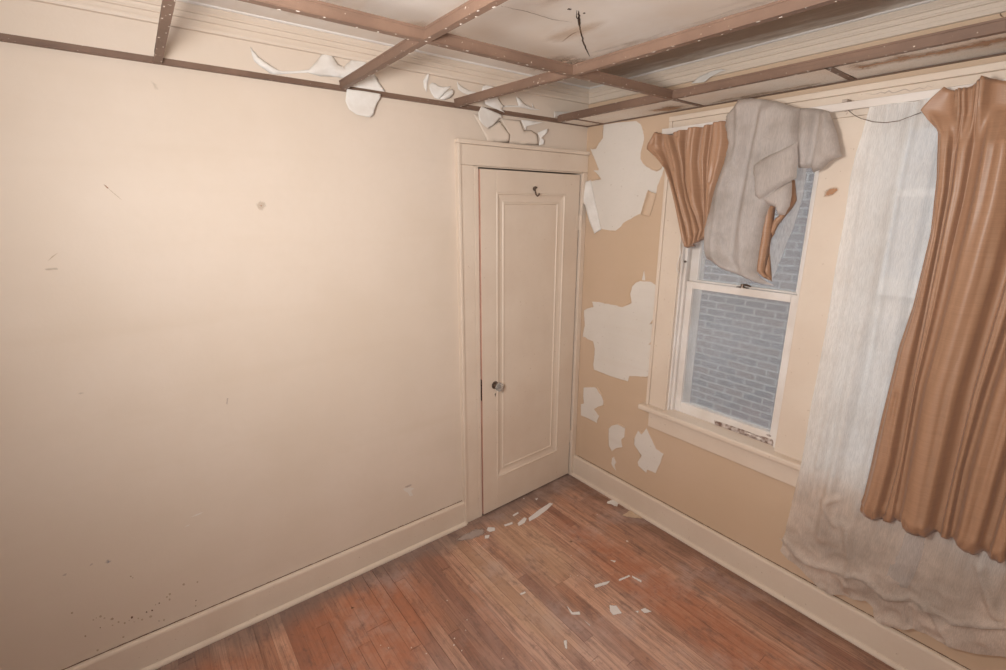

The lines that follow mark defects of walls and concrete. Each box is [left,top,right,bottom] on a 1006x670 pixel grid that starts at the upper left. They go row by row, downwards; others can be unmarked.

flaking render [584,120,665,234]
flaking render [582,270,656,382]
flaking render [580,386,665,474]